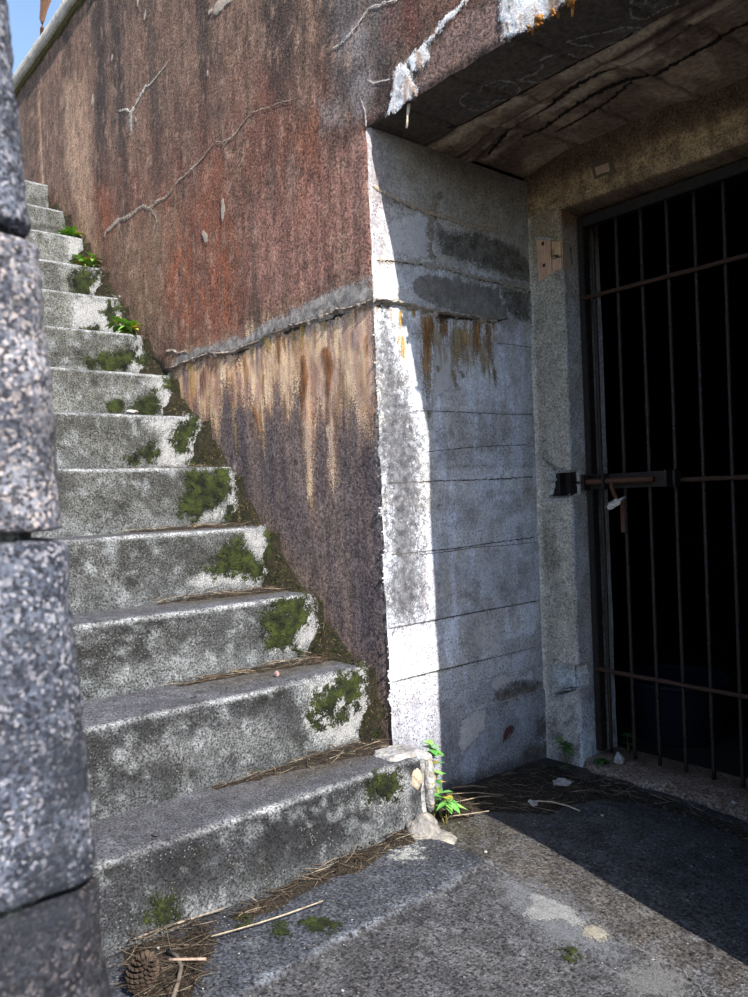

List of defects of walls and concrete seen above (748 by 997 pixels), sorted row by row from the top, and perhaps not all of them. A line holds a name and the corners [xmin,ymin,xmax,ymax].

crack [119,60,169,134]
crack [333,0,398,49]
leakage [386,0,469,115]
rust [526,8,556,33]
crack [446,22,748,156]
crack [104,92,303,238]
leakage [63,237,122,333]
rust [171,281,498,510]
leakage [372,211,532,633]
leakage [203,467,239,520]
leakage [190,526,268,589]
leakage [269,597,319,656]